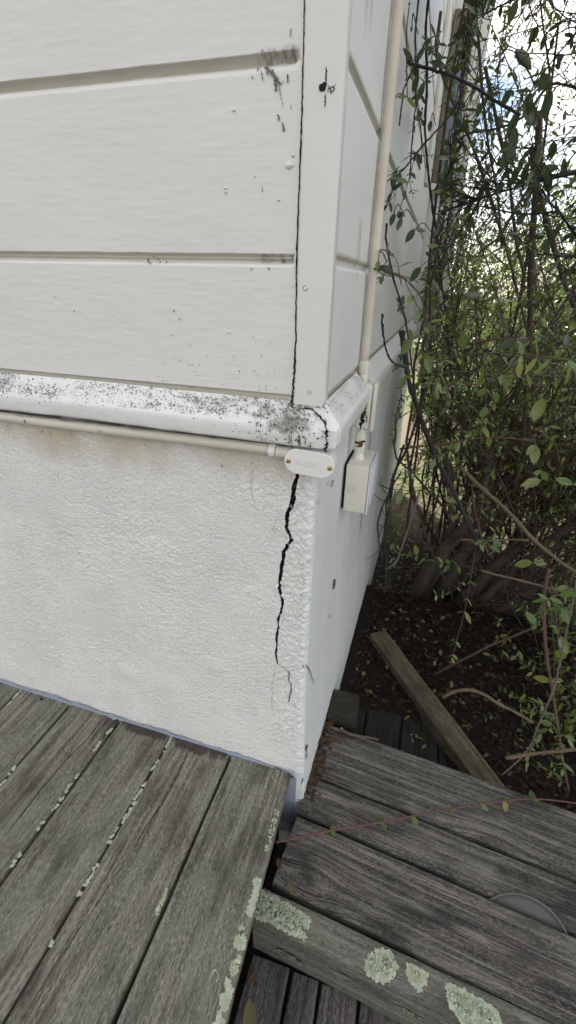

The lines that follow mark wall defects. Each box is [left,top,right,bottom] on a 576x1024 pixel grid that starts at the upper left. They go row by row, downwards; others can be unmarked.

damp [251,66,291,132]
damp [0,372,363,449]
crack [271,474,314,711]